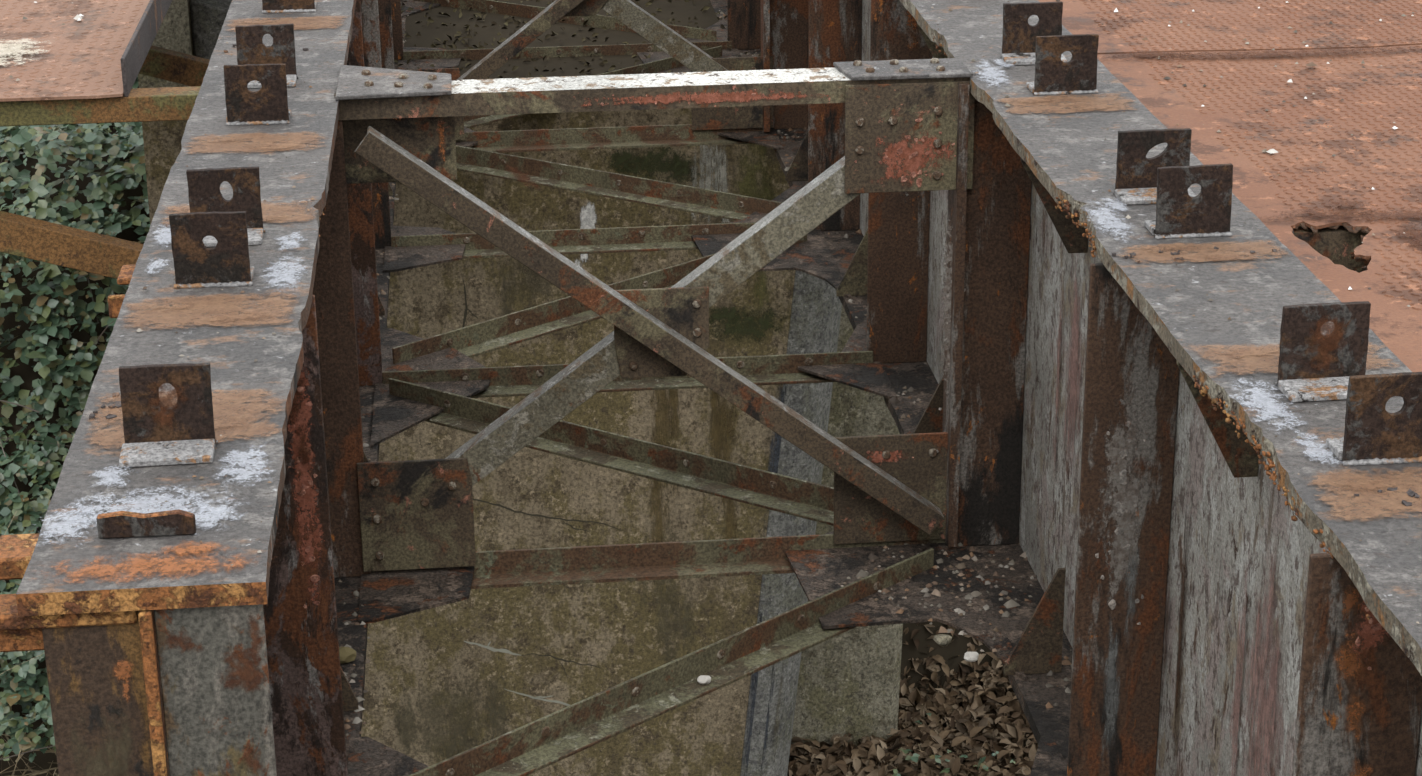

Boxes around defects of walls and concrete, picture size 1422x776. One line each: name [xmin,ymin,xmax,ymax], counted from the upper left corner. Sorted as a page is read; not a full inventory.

rust [186,131,325,154]
rust [1120,240,1288,263]
rust [124,292,298,329]
rust [1195,344,1280,375]
rust [1366,342,1399,369]
rust [1308,467,1422,521]
rust [51,541,248,583]
rust [1160,513,1192,751]
rust [221,616,264,692]